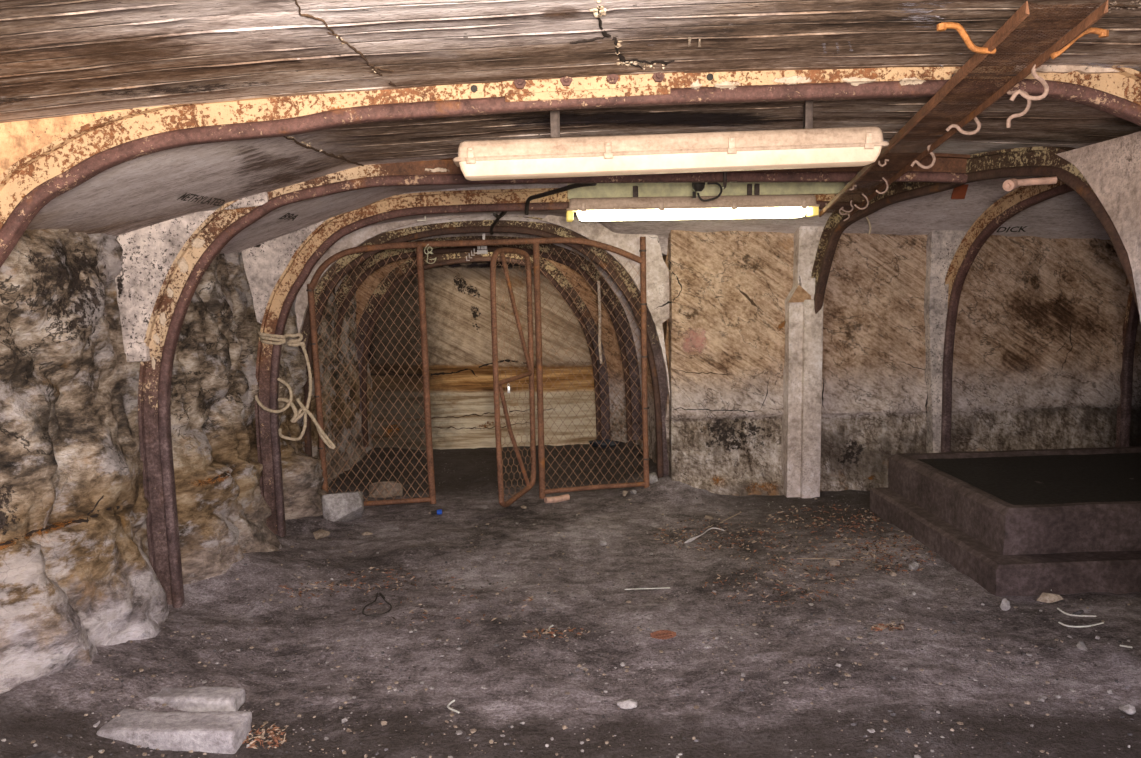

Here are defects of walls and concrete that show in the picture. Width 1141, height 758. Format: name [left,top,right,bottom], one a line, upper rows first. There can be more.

leakage [80,36,188,63]
crack [295,0,396,87]
crack [570,0,675,69]
leakage [78,82,268,98]
corrosion [0,515,84,550]